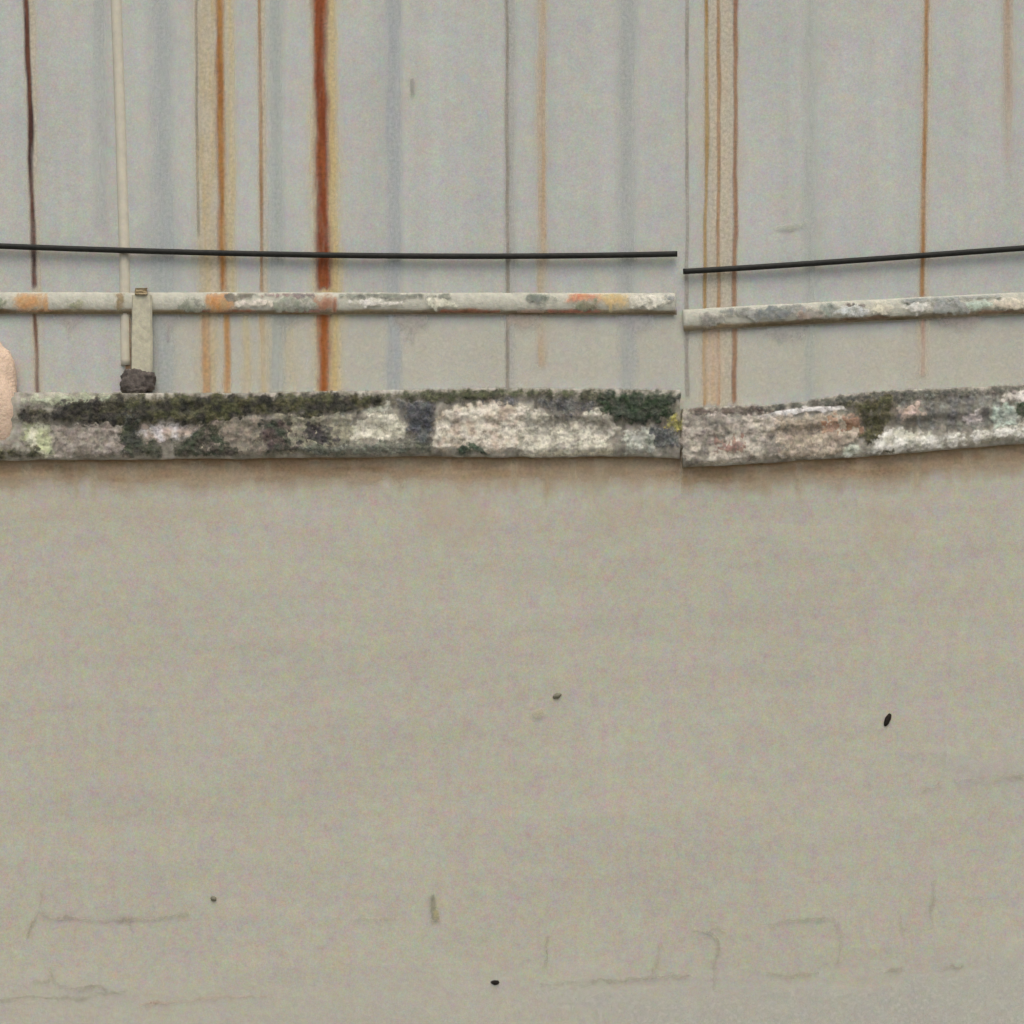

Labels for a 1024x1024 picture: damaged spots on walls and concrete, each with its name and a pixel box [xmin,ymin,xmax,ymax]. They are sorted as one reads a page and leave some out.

rust [0,0,132,393]
rust [152,0,689,393]
rust [703,0,738,309]
rust [919,0,932,297]
leakage [0,426,1024,491]
rust [684,308,1024,406]